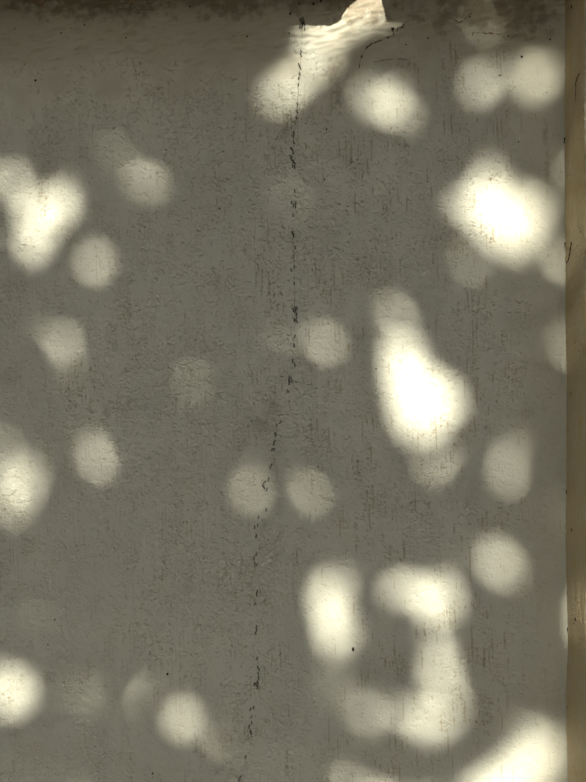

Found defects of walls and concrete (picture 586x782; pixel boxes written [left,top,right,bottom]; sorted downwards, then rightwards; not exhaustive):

crack [359,23,411,68]